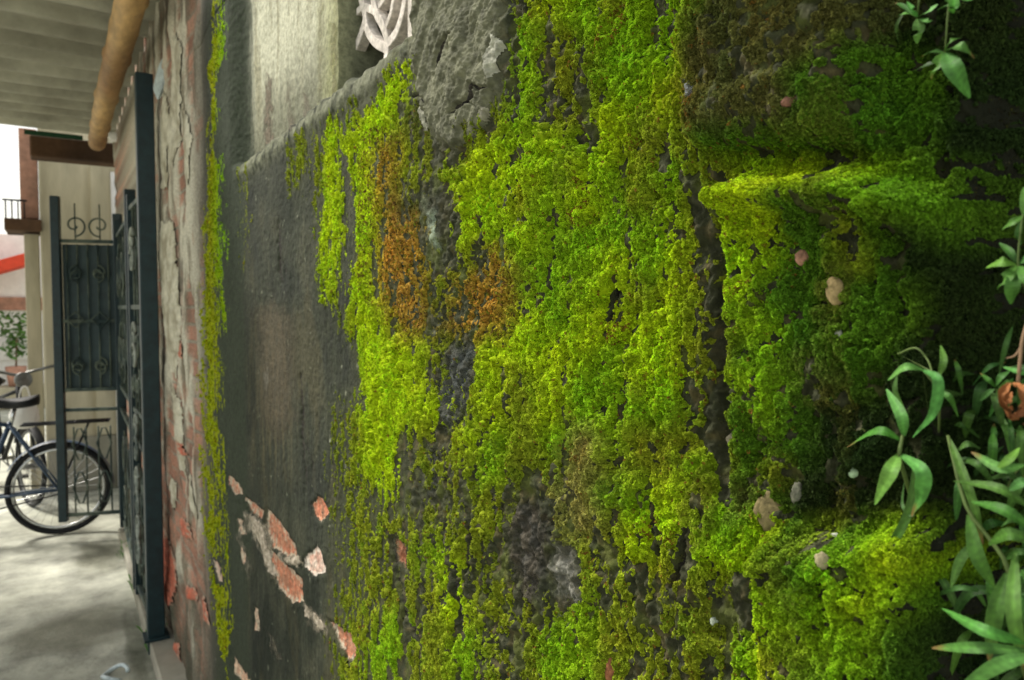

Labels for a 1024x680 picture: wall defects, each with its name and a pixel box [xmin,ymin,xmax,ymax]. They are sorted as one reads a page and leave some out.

peeling [160,32,193,189]
peeling [158,220,197,540]
flaking render [163,527,210,625]
flaking render [229,476,356,660]